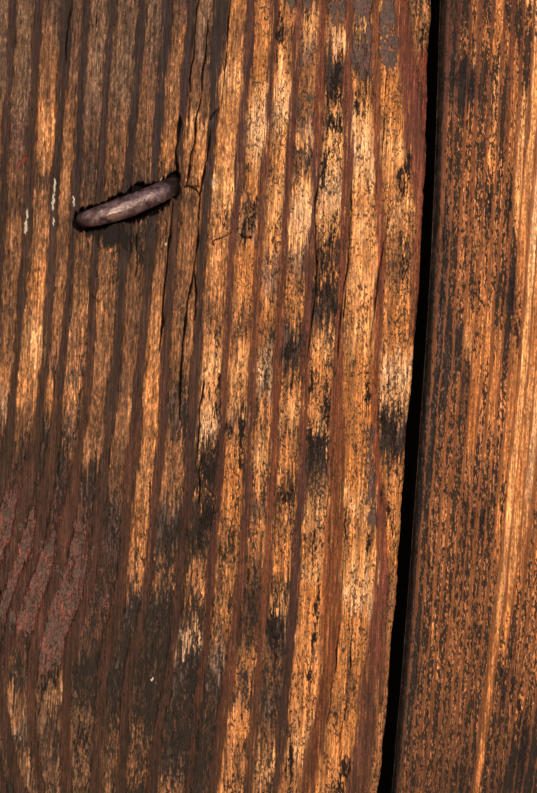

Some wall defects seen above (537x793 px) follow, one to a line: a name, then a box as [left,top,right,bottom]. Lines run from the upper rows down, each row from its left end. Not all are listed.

peeling [285,0,401,82]
crack [159,215,172,352]
crack [174,0,251,502]
peeling [0,490,115,677]